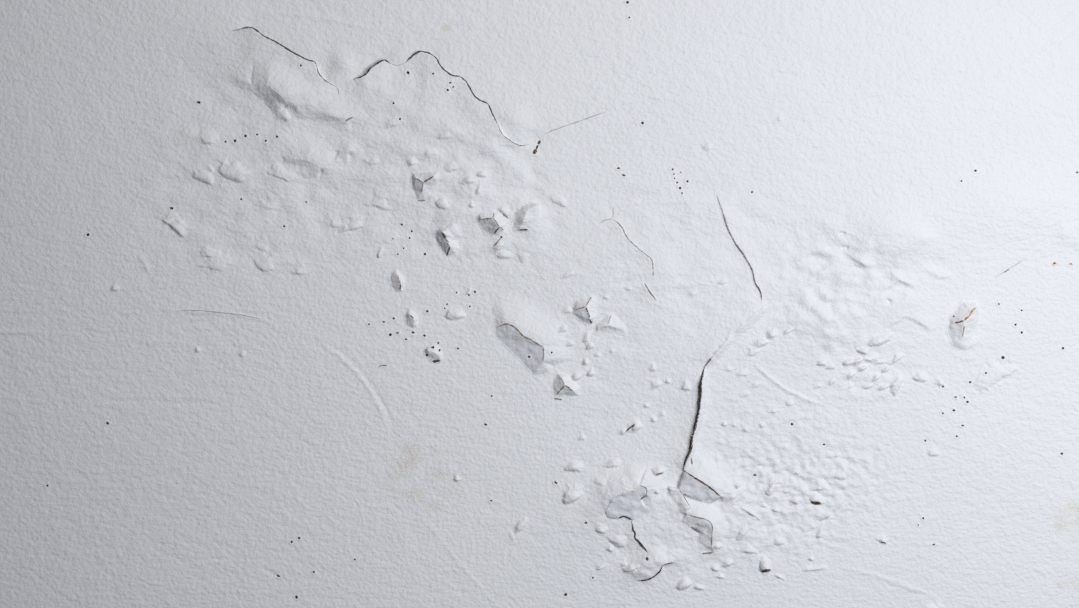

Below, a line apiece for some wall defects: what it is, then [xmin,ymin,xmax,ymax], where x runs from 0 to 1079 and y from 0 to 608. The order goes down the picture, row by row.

crack [232,25,610,154]
crack [602,217,656,300]
crack [716,194,762,301]
flaking render [493,322,582,402]
peeling [946,299,982,350]
crack [676,359,712,475]
flaking render [604,483,654,522]
crack [626,520,652,561]
peeling [636,560,672,582]
flaking render [667,469,723,556]